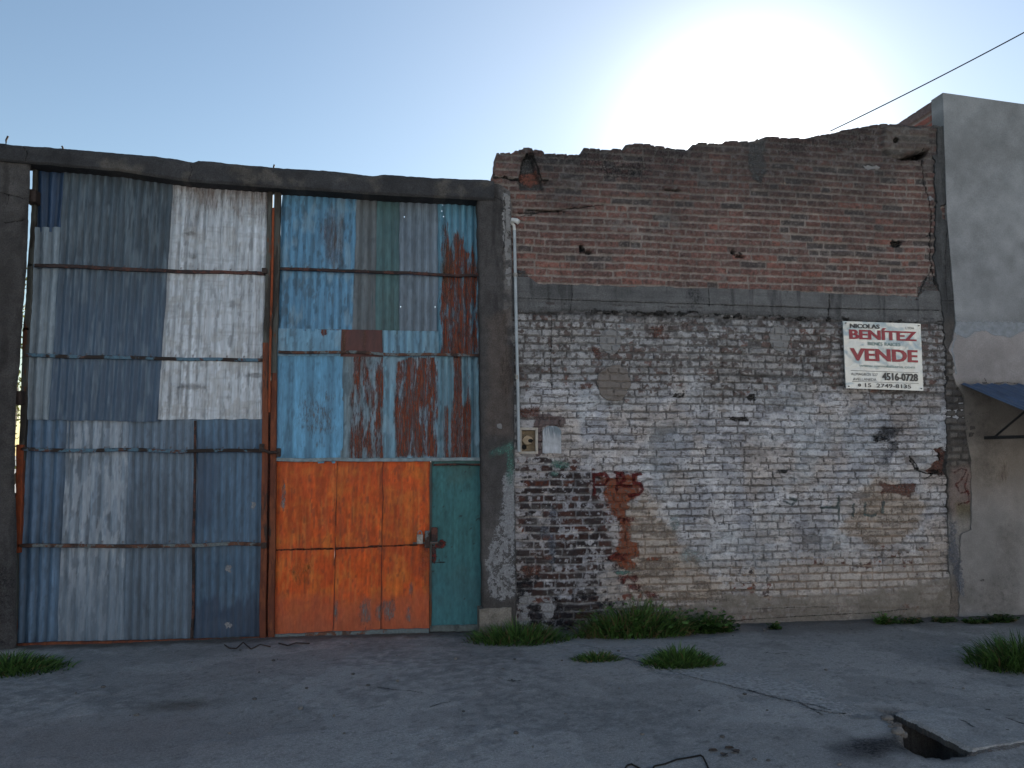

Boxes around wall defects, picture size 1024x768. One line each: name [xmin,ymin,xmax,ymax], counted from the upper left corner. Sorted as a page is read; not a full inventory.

crack [529,148,954,381]
peeling [484,469,554,602]
peeling [843,478,921,547]
spalling [925,447,945,476]